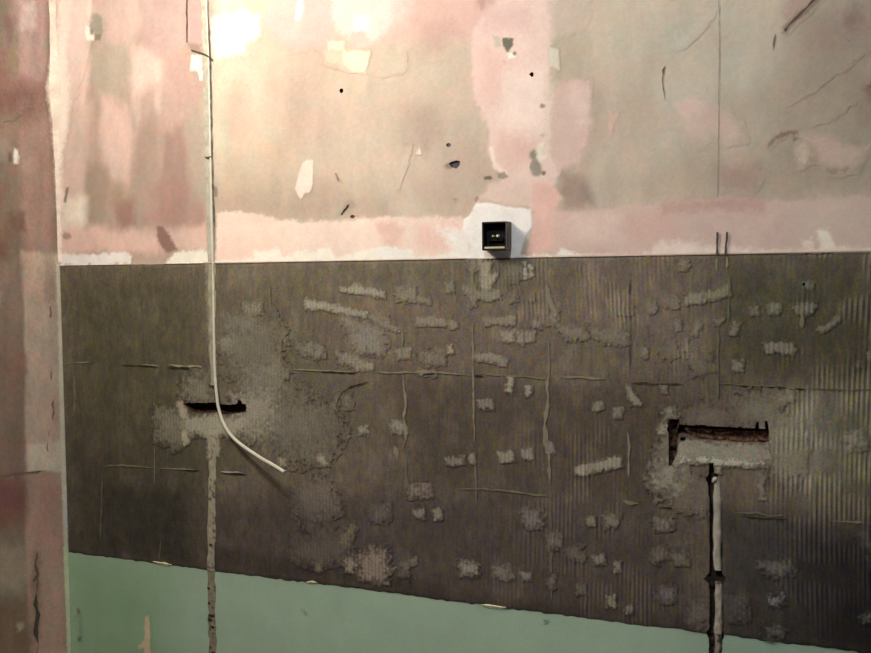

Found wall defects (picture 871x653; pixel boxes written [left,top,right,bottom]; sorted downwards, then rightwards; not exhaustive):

crack [28,547,45,653]
peeling [137,613,152,653]